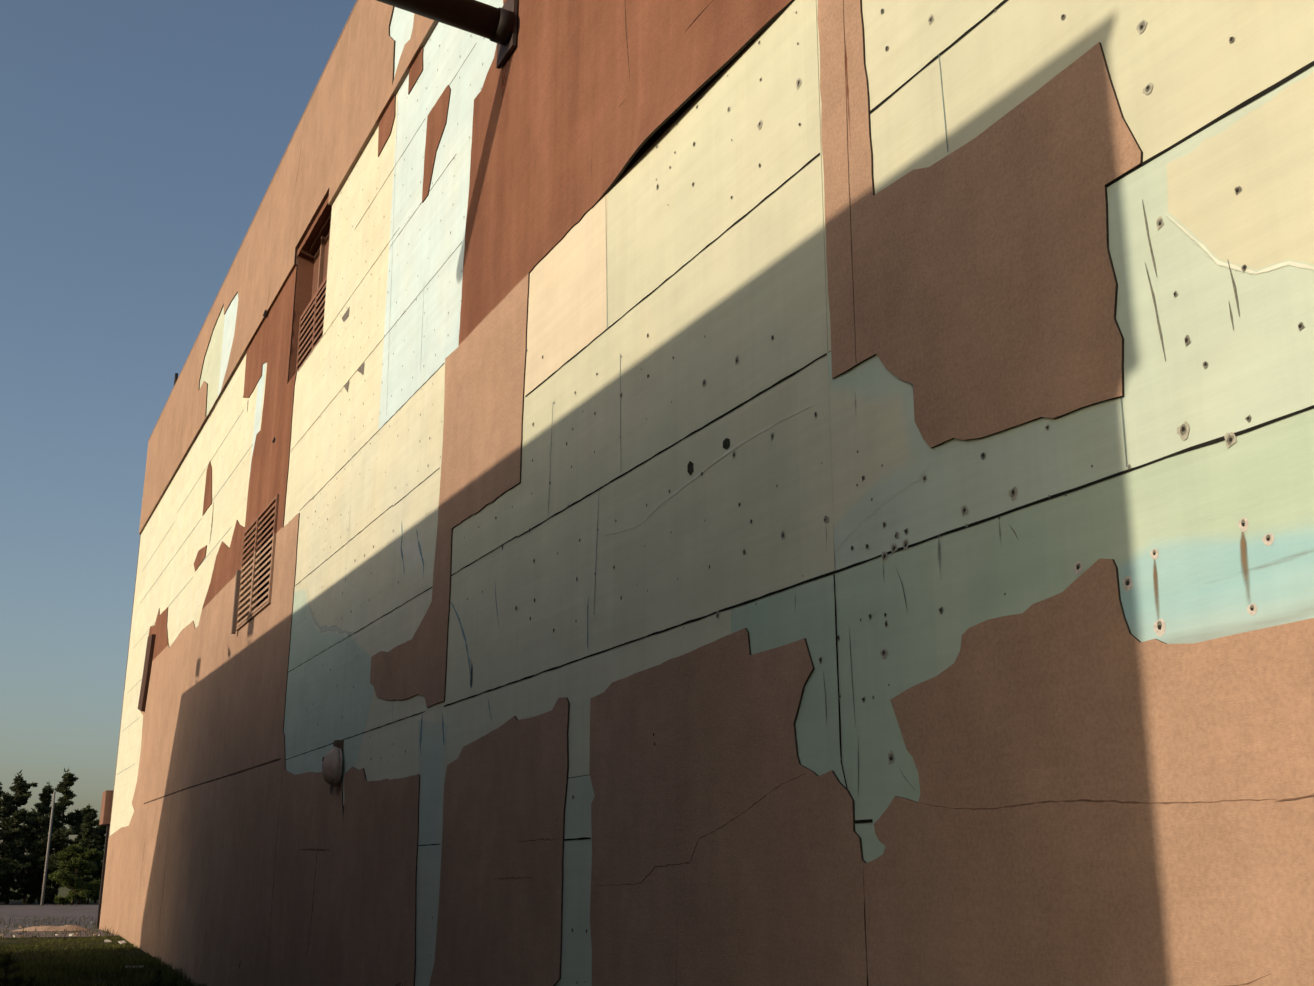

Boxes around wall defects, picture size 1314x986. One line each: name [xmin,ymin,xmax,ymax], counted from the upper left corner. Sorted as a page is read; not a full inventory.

peeling [109,293,276,836]
crack [597,774,804,886]
peeling [284,0,1314,986]
crack [923,793,1314,810]